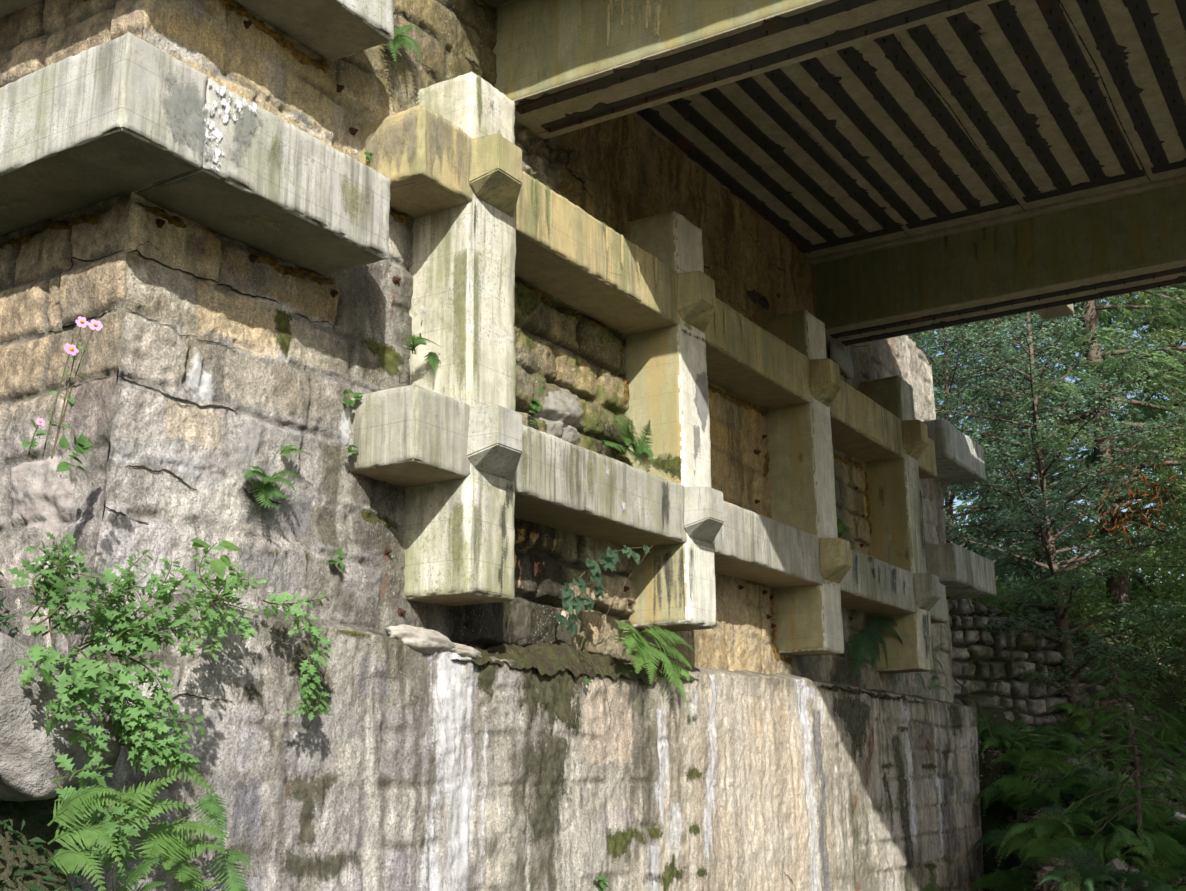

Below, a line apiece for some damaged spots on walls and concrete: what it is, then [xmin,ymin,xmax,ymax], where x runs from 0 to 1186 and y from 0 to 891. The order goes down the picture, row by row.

crack [393,0,488,75]
water stain [163,69,212,160]
water stain [231,105,263,163]
crack [37,239,334,349]
crack [66,376,237,413]
crack [126,465,197,490]
crack [148,693,236,706]
water stain [420,652,596,891]
water stain [647,709,682,891]
water stain [690,674,718,859]
water stain [796,679,872,891]
water stain [883,706,917,891]